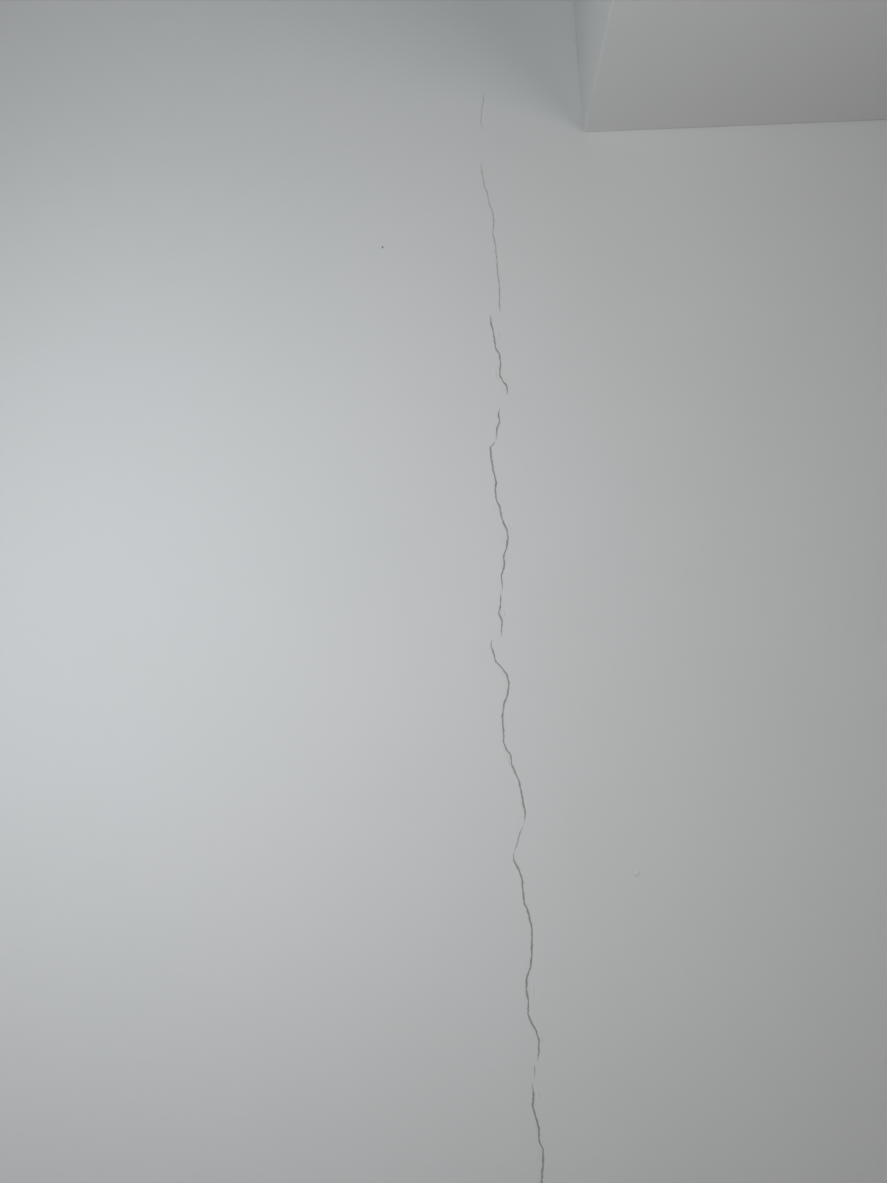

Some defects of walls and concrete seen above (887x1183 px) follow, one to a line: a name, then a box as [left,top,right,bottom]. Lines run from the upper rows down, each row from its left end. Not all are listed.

crack [481,166,544,1183]